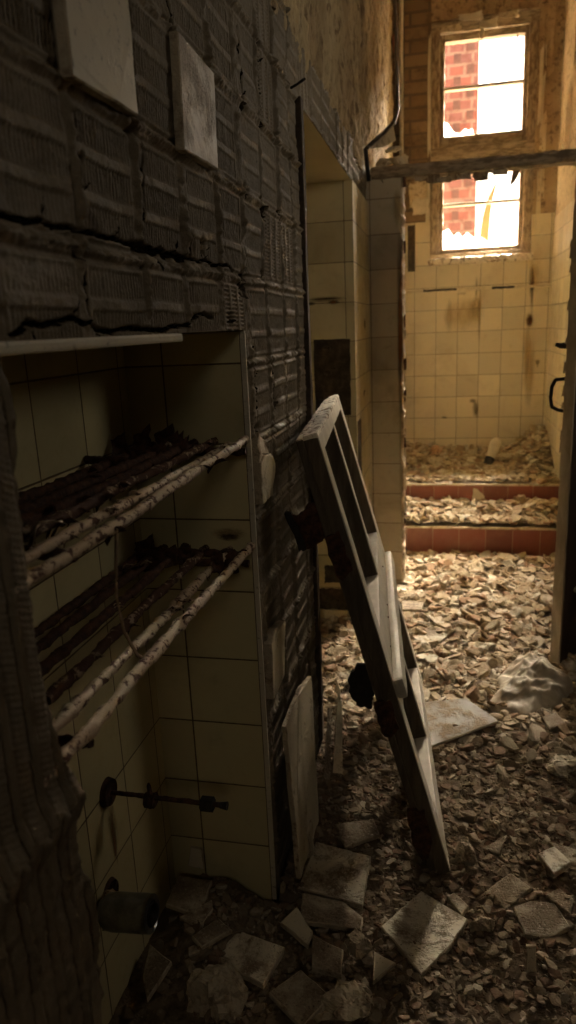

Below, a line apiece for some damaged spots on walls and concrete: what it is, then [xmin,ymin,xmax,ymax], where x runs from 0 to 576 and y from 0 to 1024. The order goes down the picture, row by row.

crack [0,196,230,349]